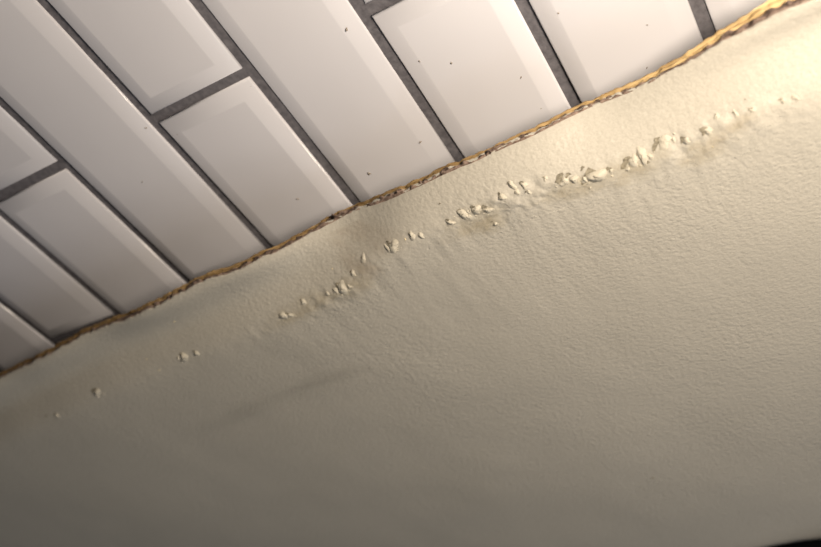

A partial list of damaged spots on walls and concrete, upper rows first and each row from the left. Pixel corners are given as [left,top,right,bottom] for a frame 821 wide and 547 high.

spalling [543,146,655,189]
spalling [446,180,532,226]